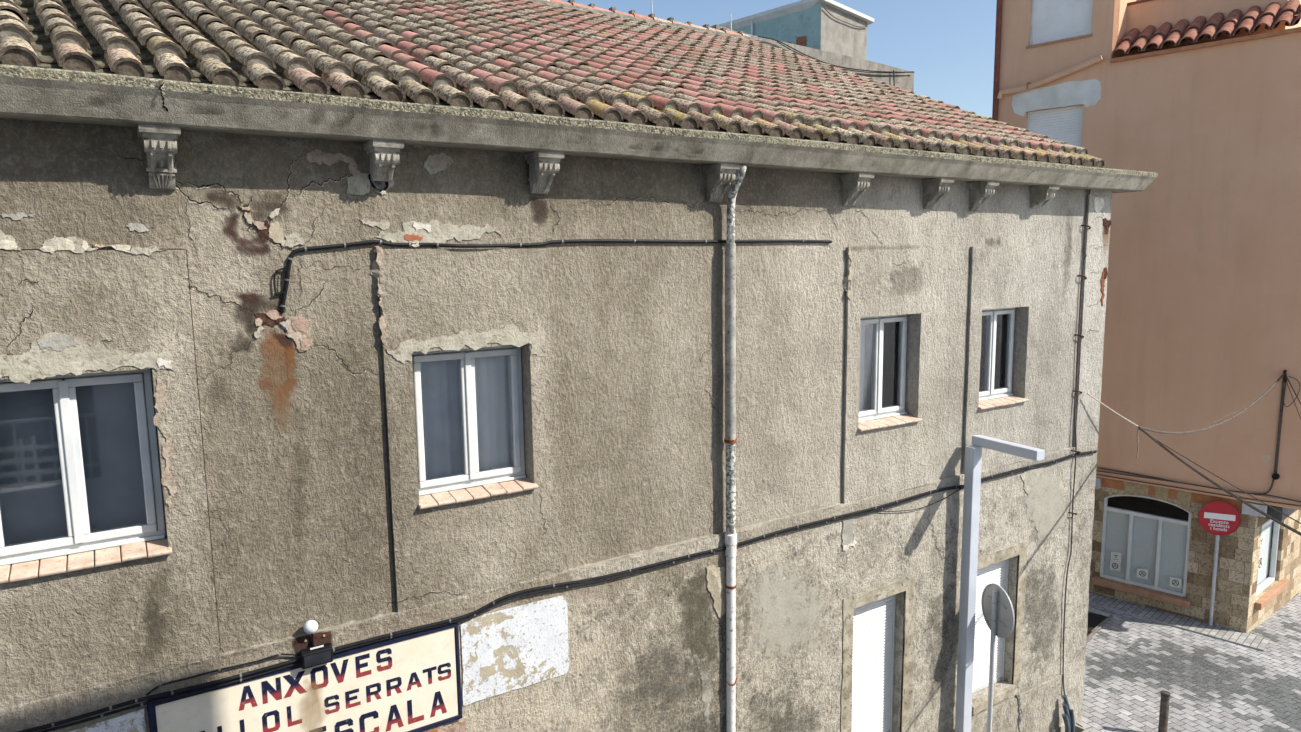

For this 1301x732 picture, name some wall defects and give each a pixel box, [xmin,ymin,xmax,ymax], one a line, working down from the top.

flaking render [0,212,35,251]
flaking render [40,223,168,256]
crack [174,151,364,379]
spalling [238,205,305,247]
flaking render [361,219,544,363]
rust [264,333,293,405]
spalling [254,310,313,352]
crack [313,342,380,376]
flaking render [0,331,177,509]
water stain [739,566,834,659]
water stain [625,575,722,732]
water stain [746,698,819,732]